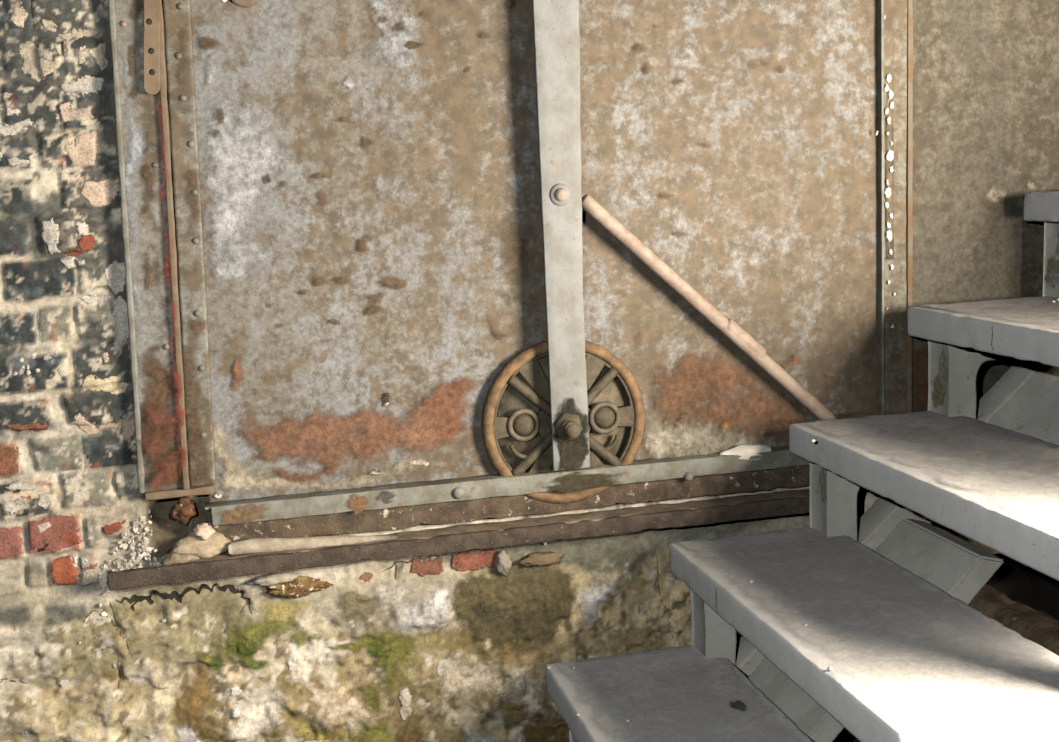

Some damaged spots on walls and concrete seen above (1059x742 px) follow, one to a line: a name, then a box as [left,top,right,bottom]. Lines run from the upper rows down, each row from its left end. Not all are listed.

corrosion [131,0,144,18]
peeling [19,19,108,166]
peeling [41,217,96,269]
peeling [79,118,144,363]
peeling [81,374,129,395]
corrosion [136,304,212,491]
corrosion [240,379,468,482]
corrosion [656,355,805,439]
spalling [0,445,97,586]
crack [87,583,253,689]
leakage [454,565,616,655]
leakage [177,664,228,740]